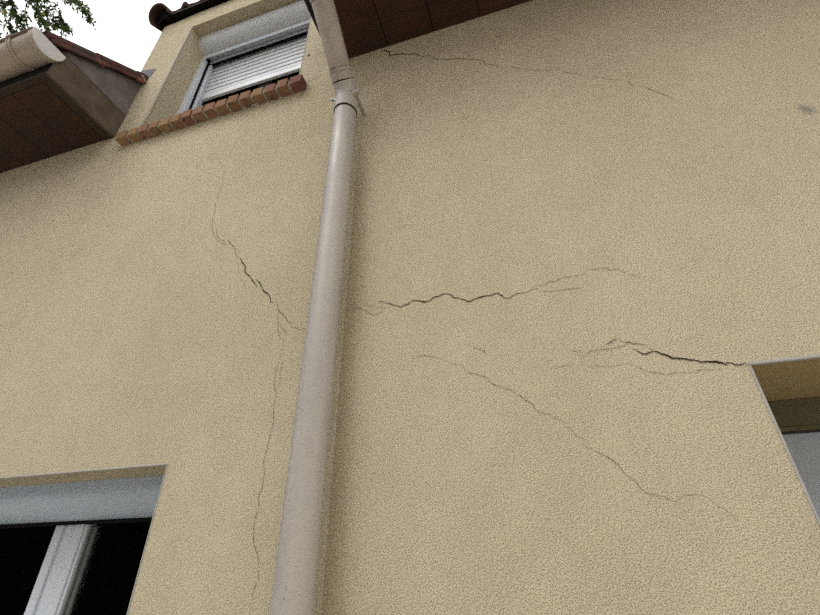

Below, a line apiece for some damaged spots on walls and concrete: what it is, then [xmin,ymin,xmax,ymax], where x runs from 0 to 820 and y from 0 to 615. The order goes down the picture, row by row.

crack [344,268,627,314]
crack [551,338,747,374]